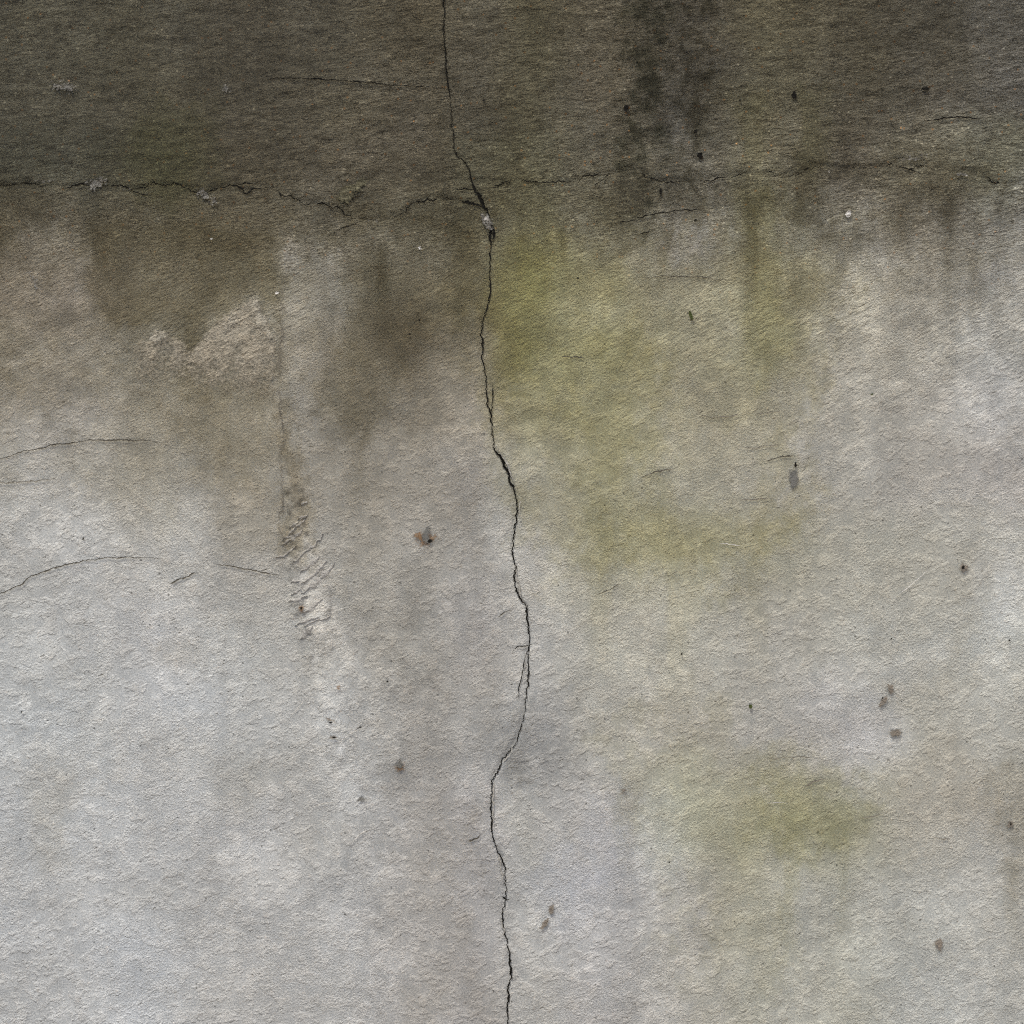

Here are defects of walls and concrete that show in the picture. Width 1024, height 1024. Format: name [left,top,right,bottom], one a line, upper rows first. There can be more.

damp [85,177,107,193]
crack [642,166,820,183]
crack [0,181,364,237]
crack [605,209,700,235]
crack [271,0,610,1024]
crack [1,556,159,593]